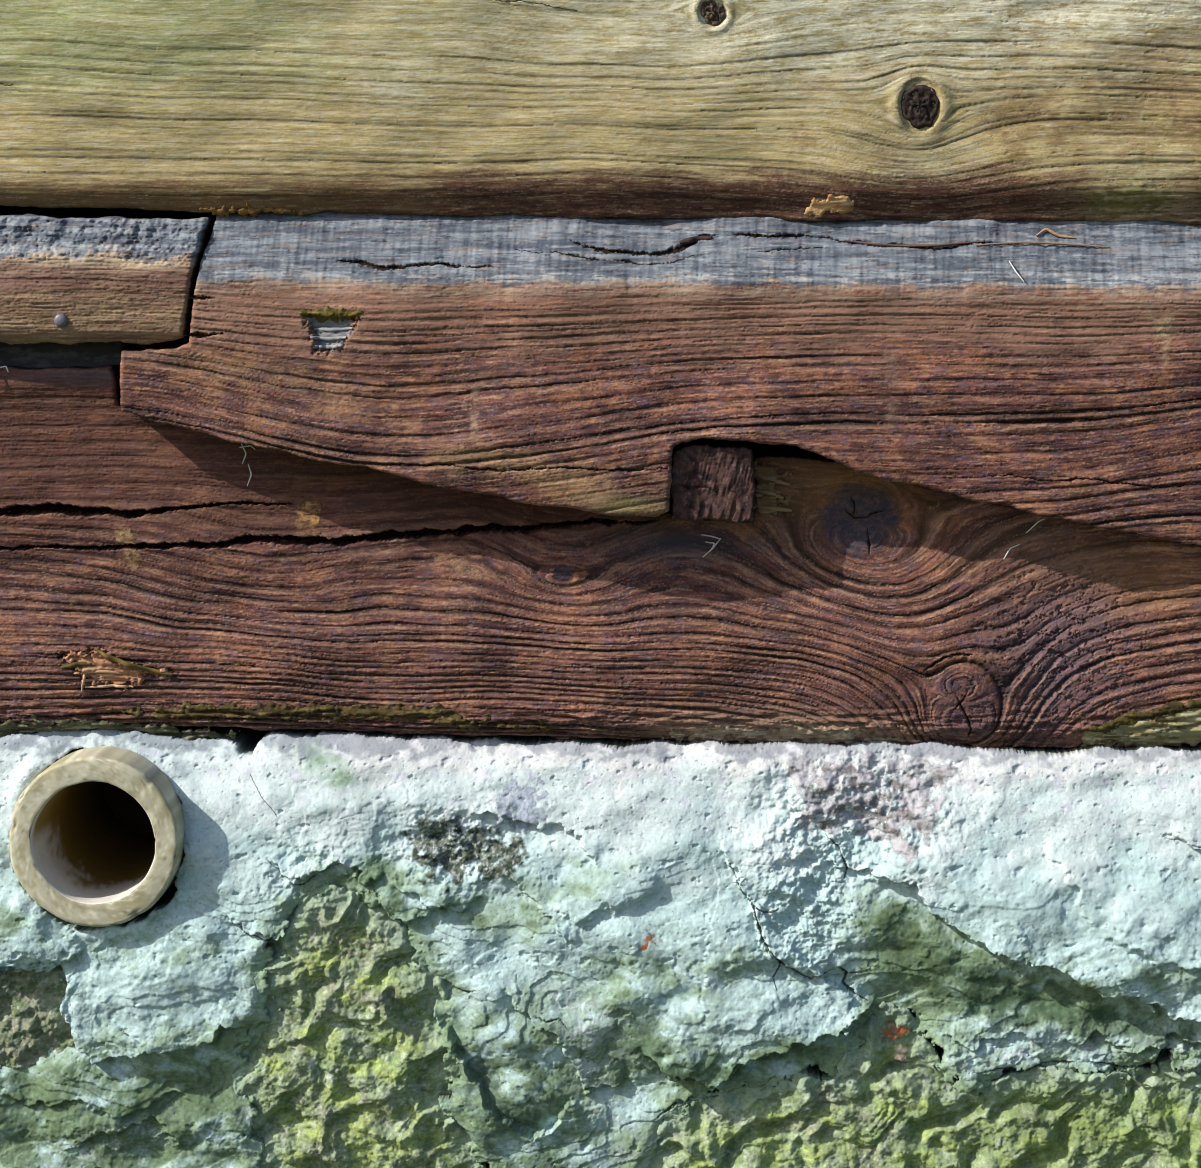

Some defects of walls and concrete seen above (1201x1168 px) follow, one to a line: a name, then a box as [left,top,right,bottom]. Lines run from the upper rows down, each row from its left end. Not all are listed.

crack [338,234,1019,271]
crack [0,501,655,549]
crack [826,835,848,878]
crack [728,860,876,1001]
spalling [0,960,75,1069]
spalling [228,879,488,1168]
spalling [646,1001,1201,1168]